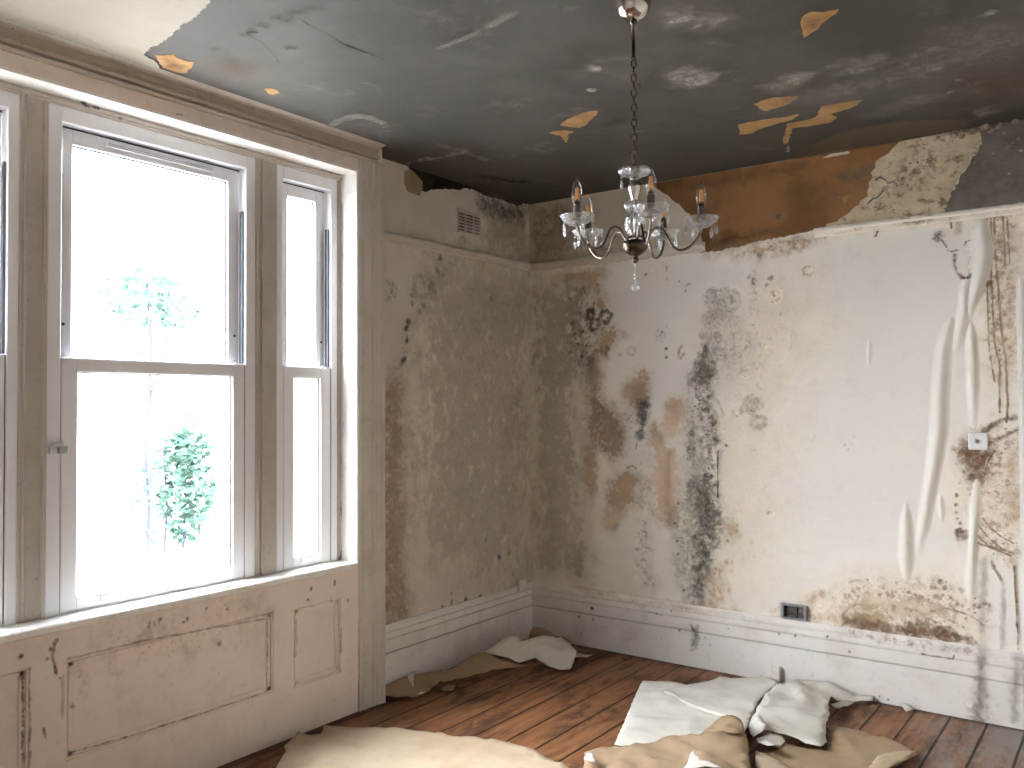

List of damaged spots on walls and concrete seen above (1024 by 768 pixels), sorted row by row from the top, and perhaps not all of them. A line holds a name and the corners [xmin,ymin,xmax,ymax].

spalling [800,9,839,38]
spalling [155,54,195,73]
spalling [550,111,598,142]
peeling [404,169,423,196]
peeling [653,96,1024,259]
leakage [481,195,585,252]
leakage [385,379,408,619]